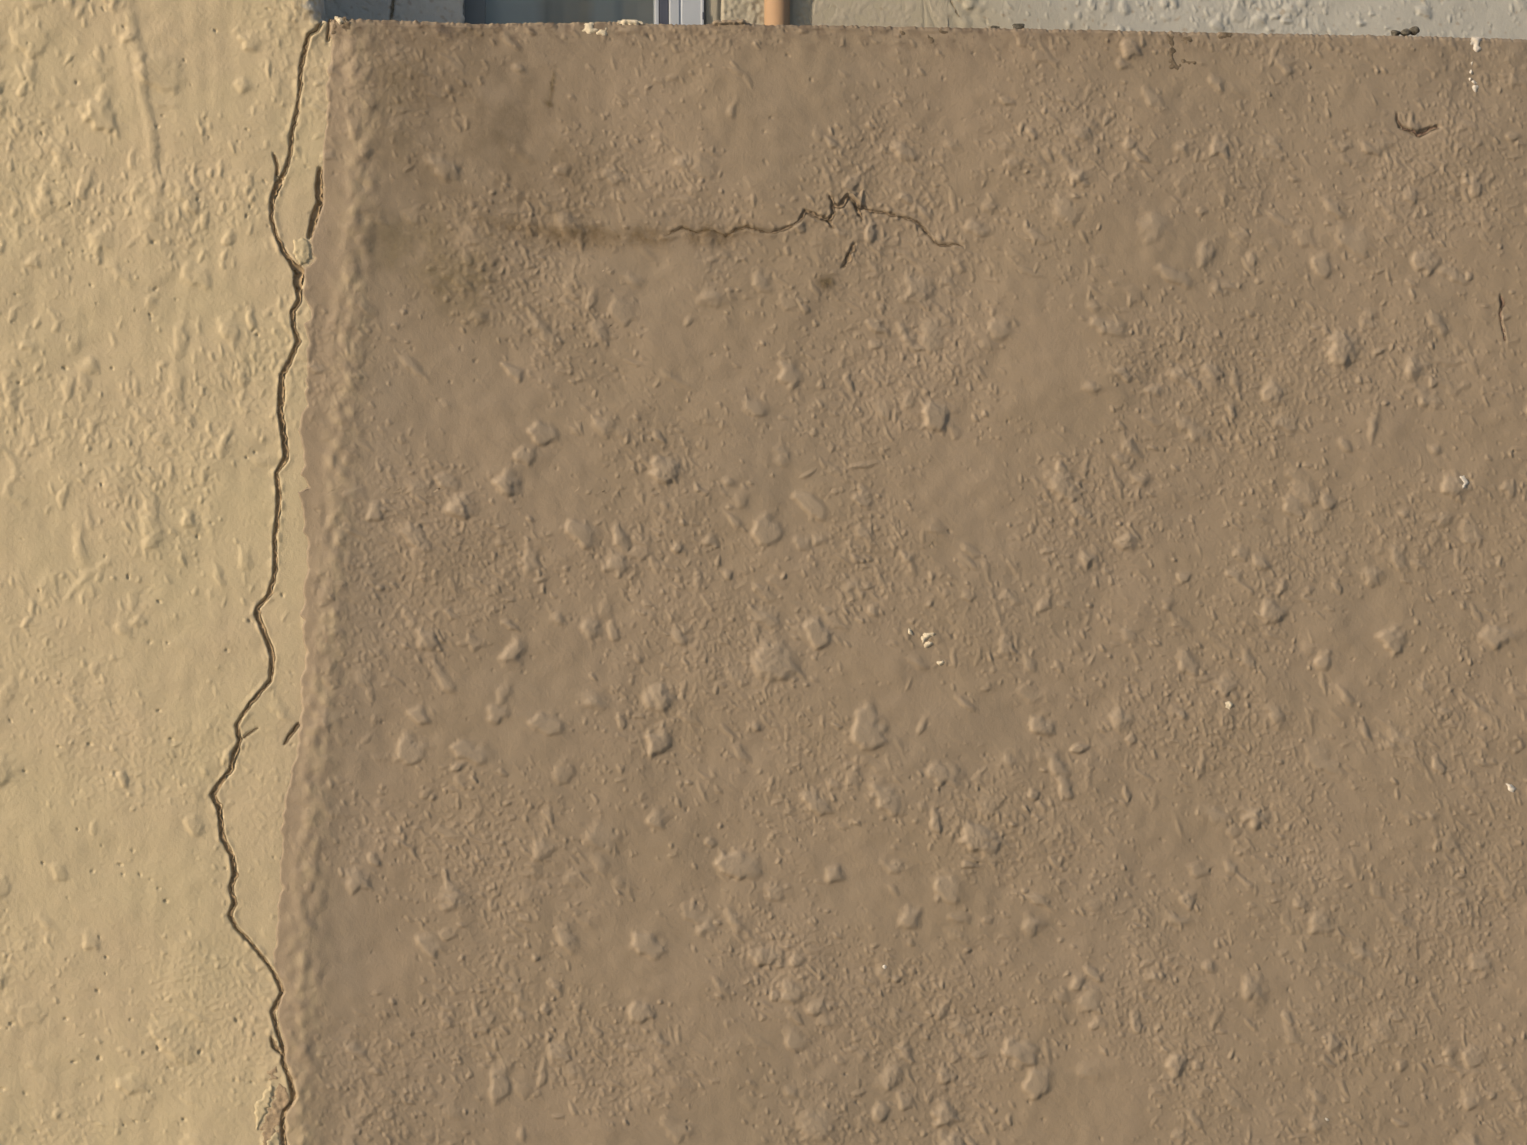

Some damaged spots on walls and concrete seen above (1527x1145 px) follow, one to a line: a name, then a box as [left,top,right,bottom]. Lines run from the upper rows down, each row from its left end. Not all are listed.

crack [211,19,331,1145]
crack [668,189,961,268]